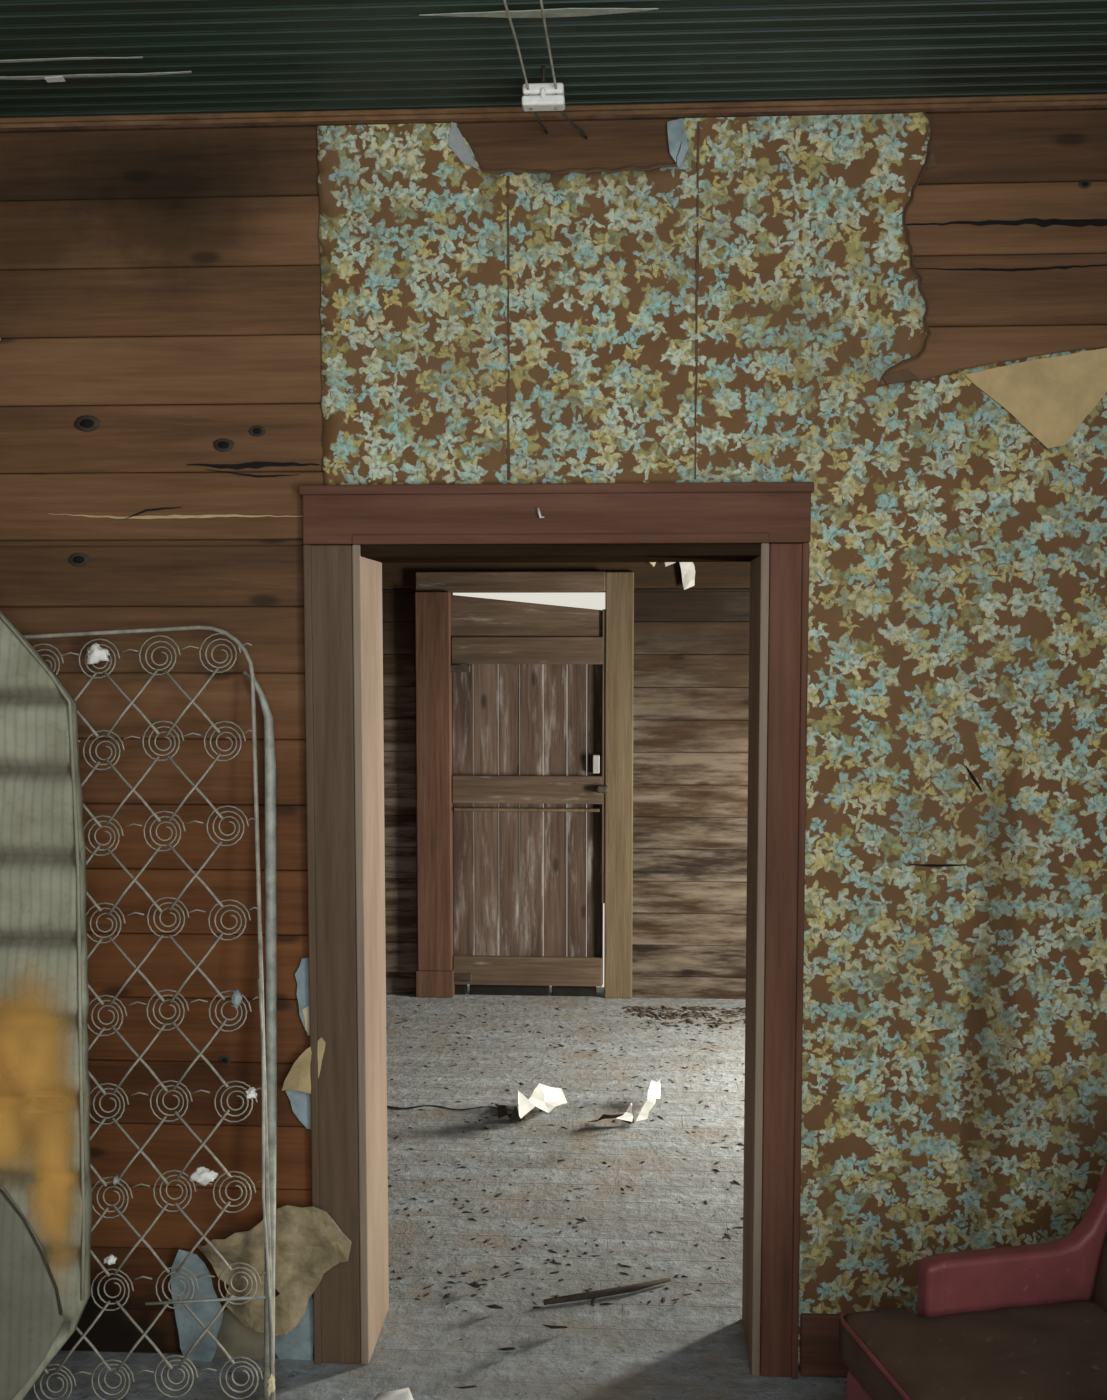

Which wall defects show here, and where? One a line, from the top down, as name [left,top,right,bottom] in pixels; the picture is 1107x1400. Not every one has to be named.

crack [906,218,1107,227]
crack [911,264,1107,272]
peeling [883,369,919,385]